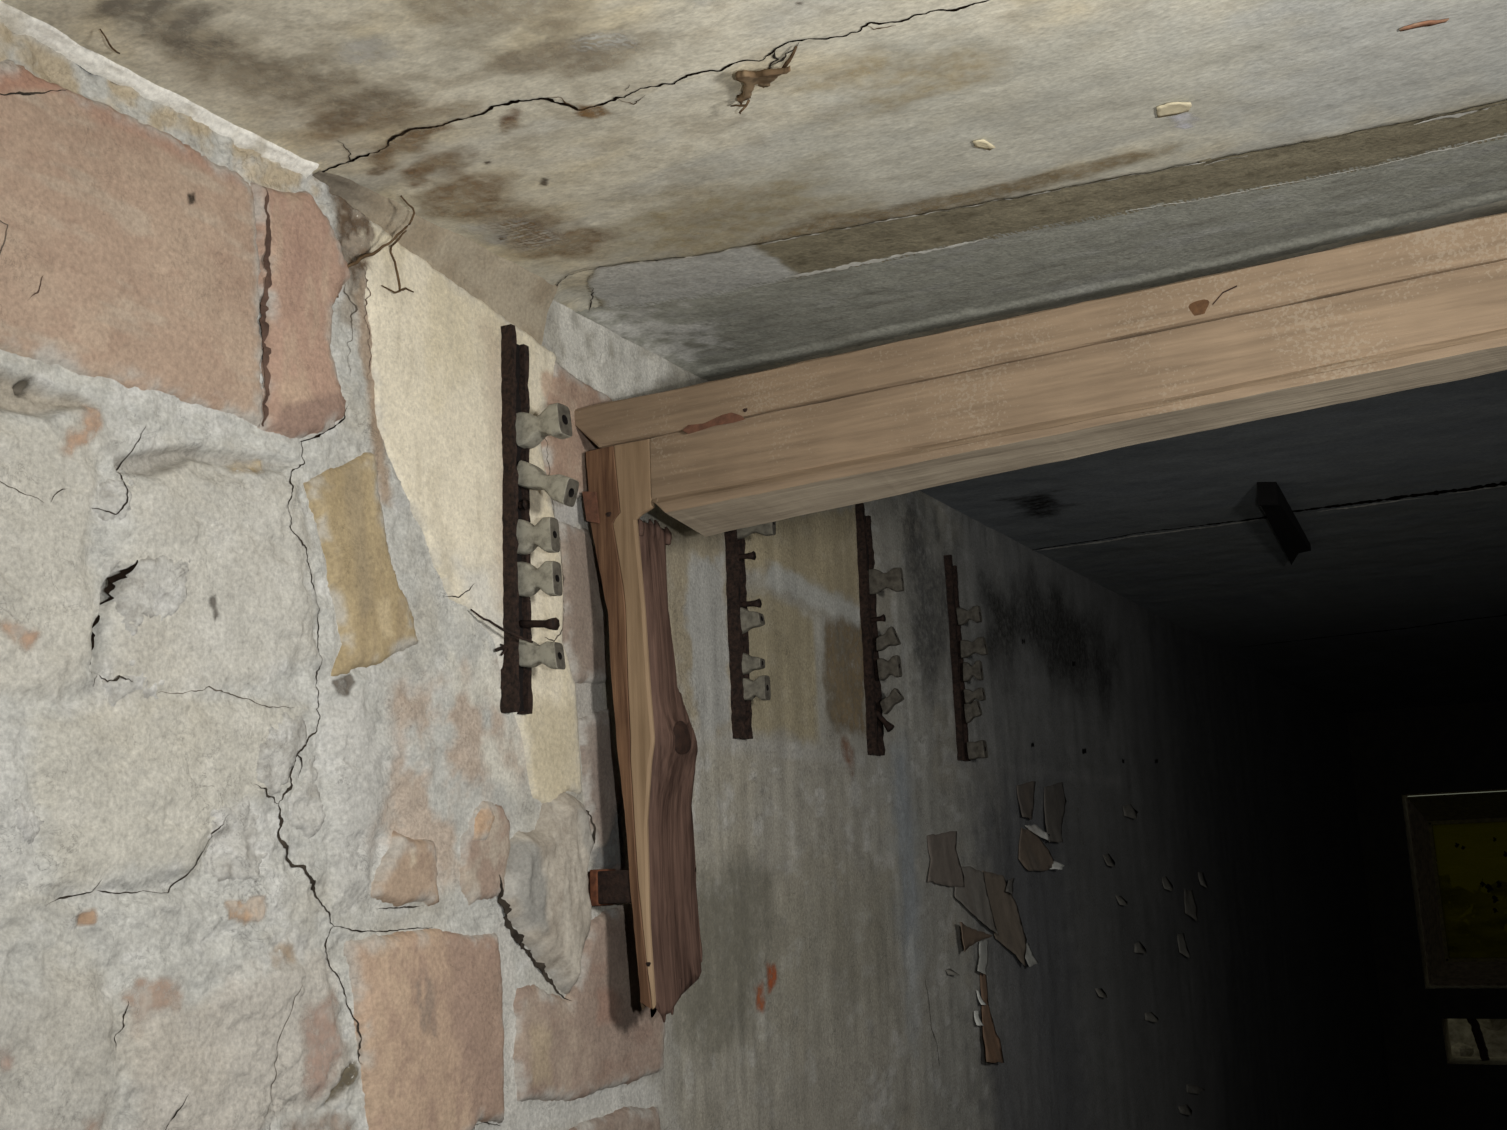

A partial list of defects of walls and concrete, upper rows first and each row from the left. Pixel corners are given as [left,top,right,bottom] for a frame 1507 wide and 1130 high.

damp [424,0,639,71]
crack [0,88,69,96]
damp [99,0,602,256]
damp [578,106,608,118]
crack [322,0,989,172]
damp [760,153,1147,243]
flaking render [557,99,1507,379]
peeling [100,555,191,638]
crack [91,260,432,1124]
peeling [927,831,965,887]
peeling [1018,824,1064,871]
peeling [974,972,1004,1063]